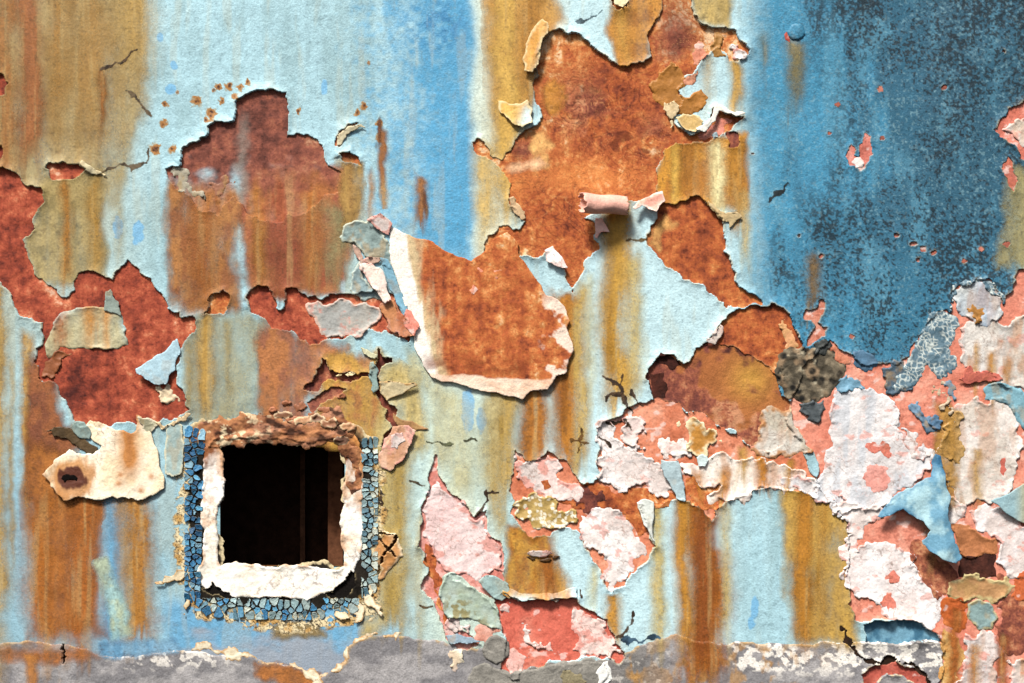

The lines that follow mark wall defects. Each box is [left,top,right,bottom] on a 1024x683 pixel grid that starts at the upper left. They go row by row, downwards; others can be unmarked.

crack [100,49,138,71]
crack [102,148,150,173]
crack [125,90,152,117]
corrosion [0,0,425,683]
peeling [335,123,392,302]
crack [570,374,644,453]
corrosion [473,0,803,601]
peeling [509,269,1024,683]
peeling [419,454,625,683]
corrosion [652,500,729,683]
corrosion [781,490,857,648]